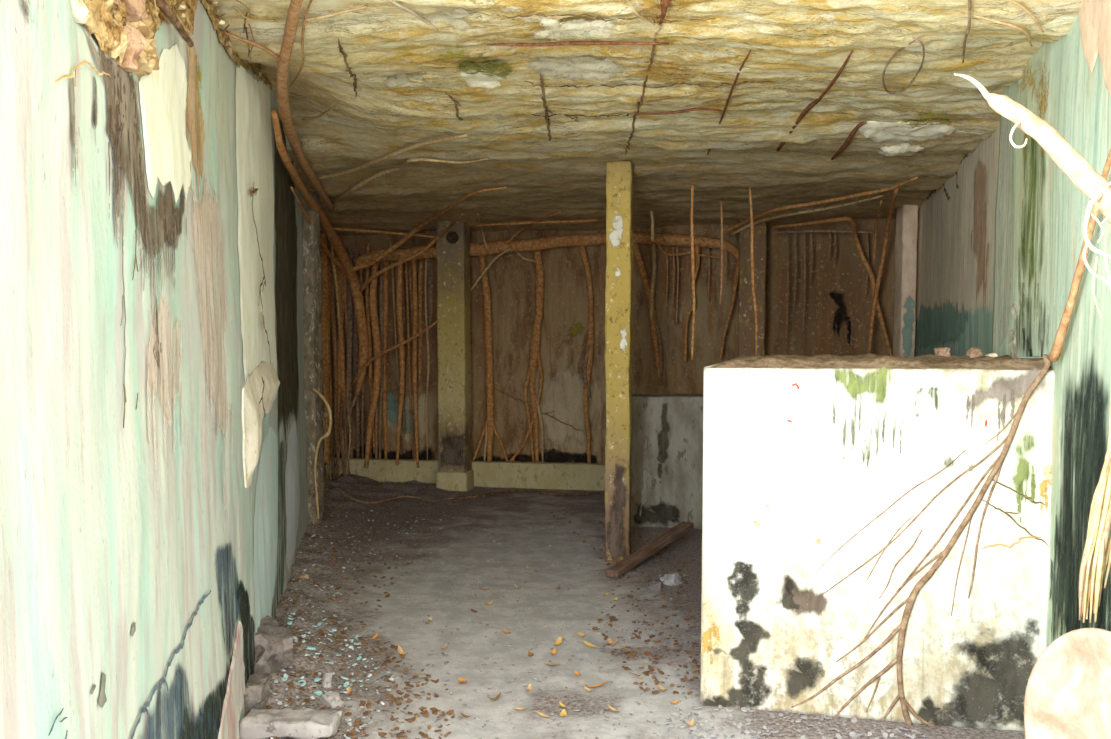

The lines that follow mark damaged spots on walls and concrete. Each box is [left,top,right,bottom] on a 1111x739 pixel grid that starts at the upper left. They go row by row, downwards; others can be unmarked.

spalling [70,0,273,202]
crack [338,38,357,98]
corrosion [487,0,684,47]
crack [502,13,778,156]
peeling [1078,0,1111,97]
damp [85,28,233,480]
damp [833,367,901,473]
damp [703,561,771,708]
damp [780,575,827,615]
damp [787,658,823,697]
damp [918,364,1111,728]